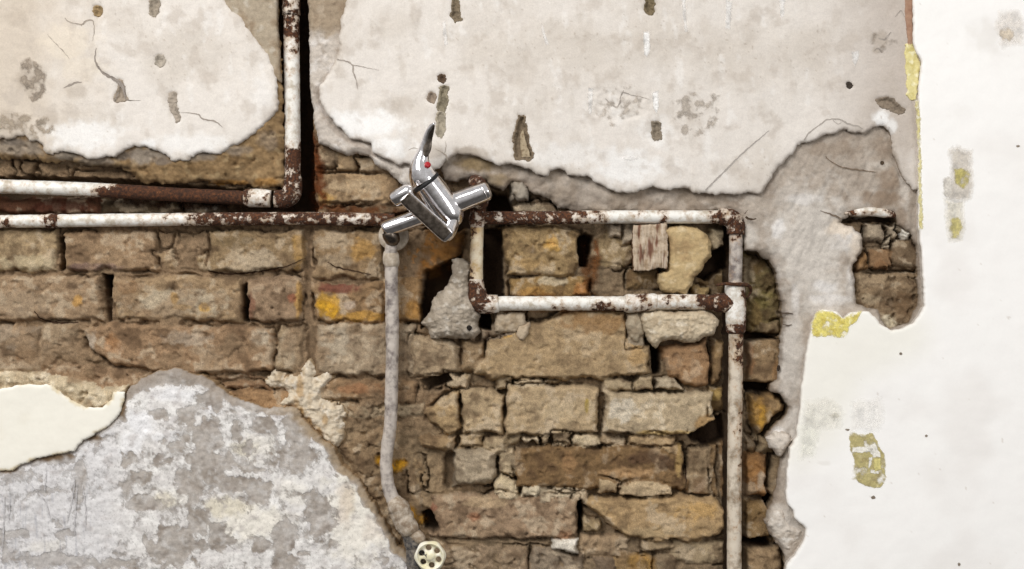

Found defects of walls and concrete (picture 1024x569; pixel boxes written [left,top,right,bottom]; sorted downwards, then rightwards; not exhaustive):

crack [47,18,140,101]
crack [337,59,376,89]
crack [181,112,222,127]
crack [804,118,863,140]
crack [705,131,768,190]
flaking render [0,0,729,569]
flaking render [436,0,923,569]